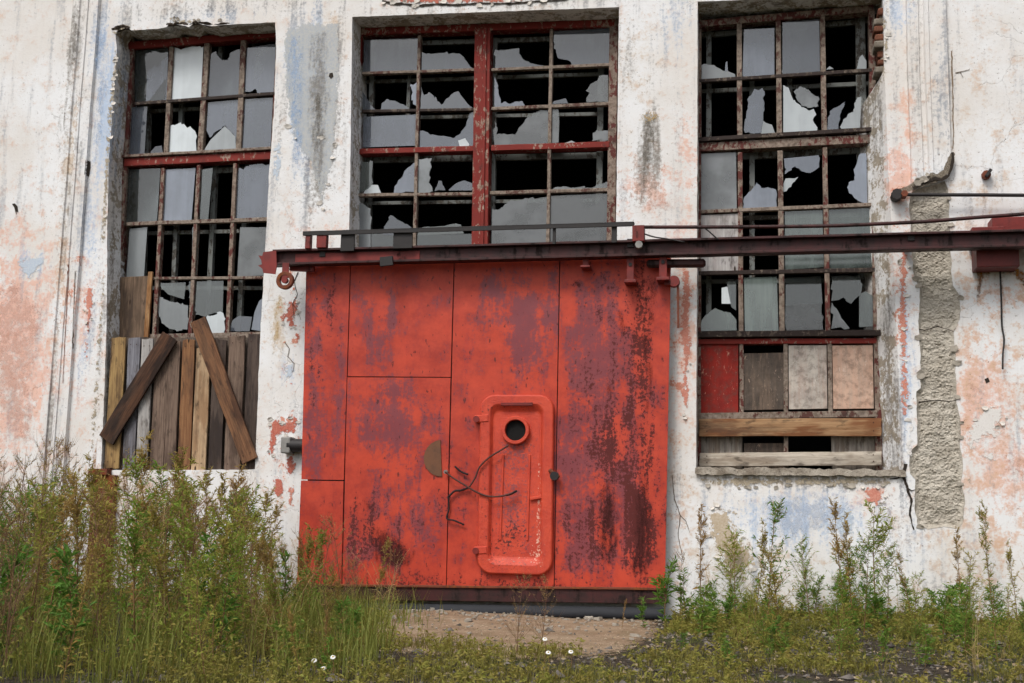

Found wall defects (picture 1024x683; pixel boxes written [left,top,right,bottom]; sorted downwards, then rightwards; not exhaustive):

flaking render [166,16,230,28]
leakage [291,40,324,163]
leakage [642,110,659,161]
flaking render [900,152,955,232]
peeling [679,271,693,419]
flaking render [897,251,1008,529]
peeling [267,416,301,506]
corrosion [372,529,408,564]
corrosion [602,483,617,558]
crack [890,464,915,530]